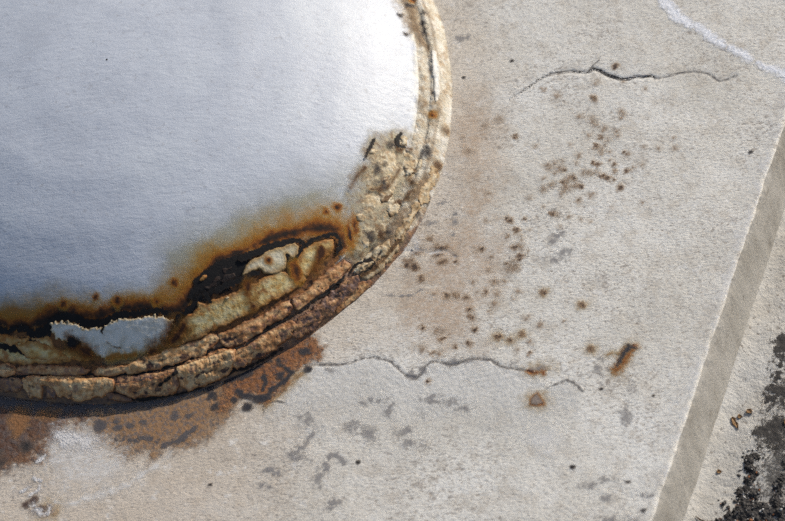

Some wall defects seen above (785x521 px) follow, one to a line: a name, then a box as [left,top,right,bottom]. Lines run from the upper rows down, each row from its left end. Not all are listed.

rust [420,99,441,119]
peeling [431,50,441,102]
crack [509,60,733,100]
rust [542,120,643,202]
peeling [0,166,439,403]
rust [0,160,447,372]
rust [388,212,493,349]
rust [482,217,529,306]
rust [0,334,324,474]
rust [587,343,638,376]
water stain [752,332,785,502]